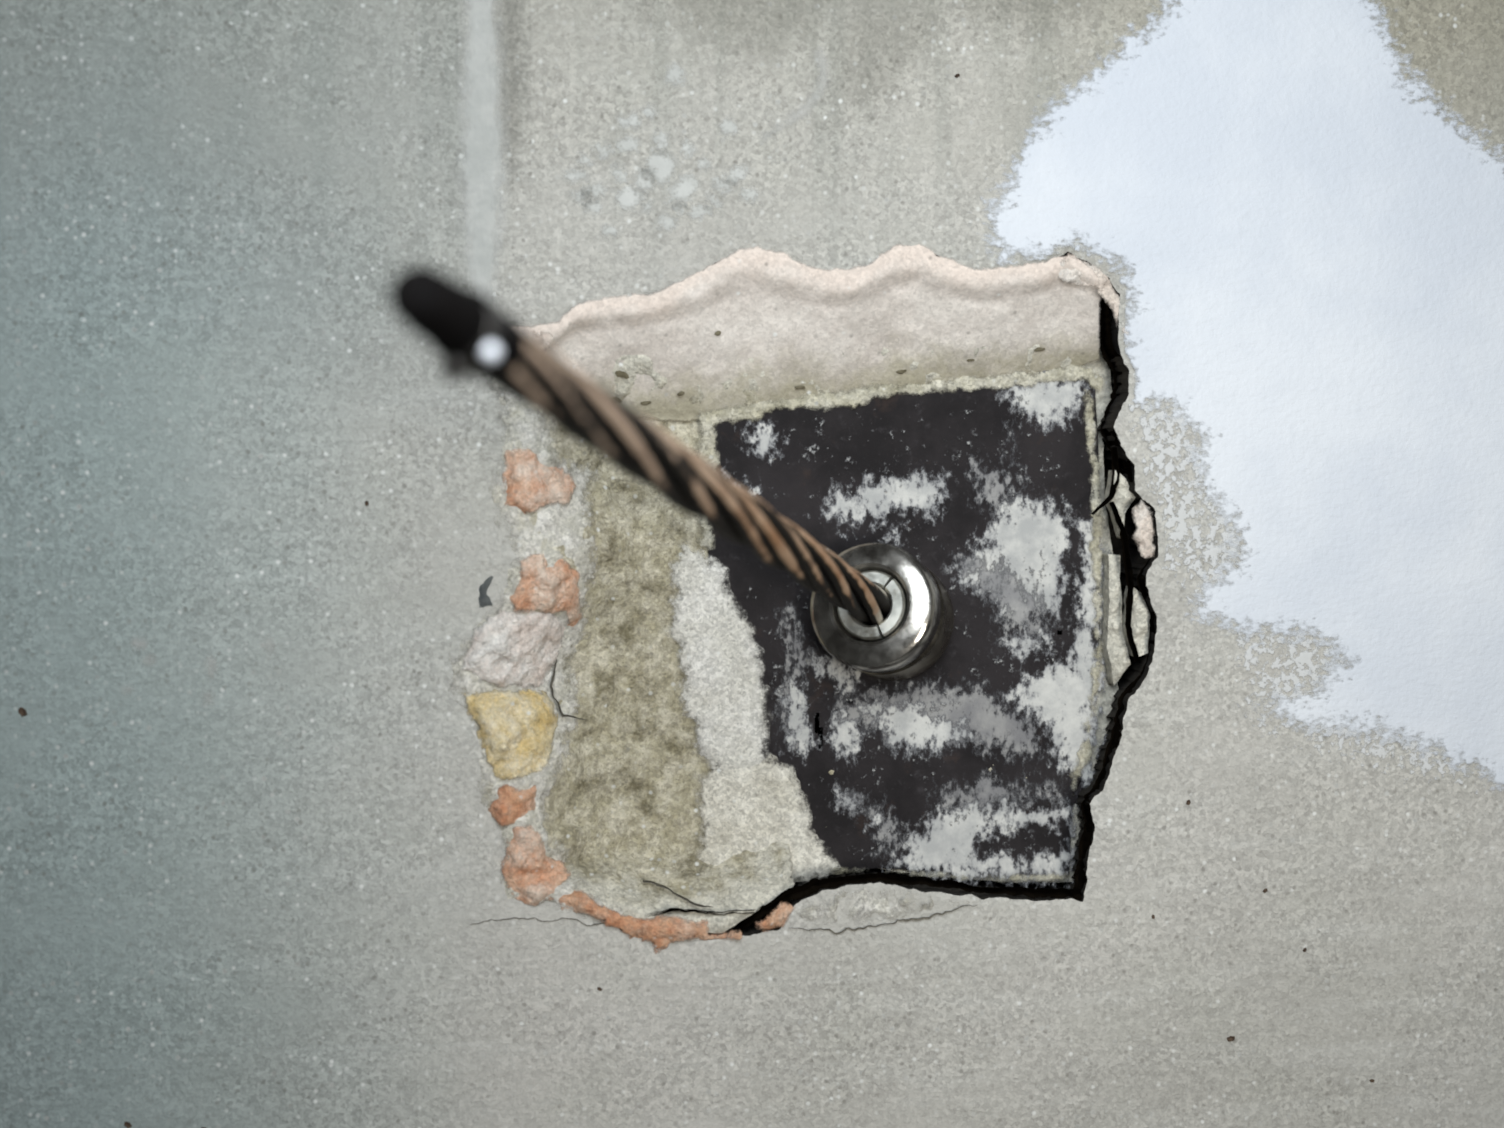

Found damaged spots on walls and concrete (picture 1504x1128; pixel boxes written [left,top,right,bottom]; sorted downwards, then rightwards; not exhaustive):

crack [471,917,605,926]
spalling [449,382,934,953]
spalling [521,244,1155,883]
crack [643,300,1155,941]